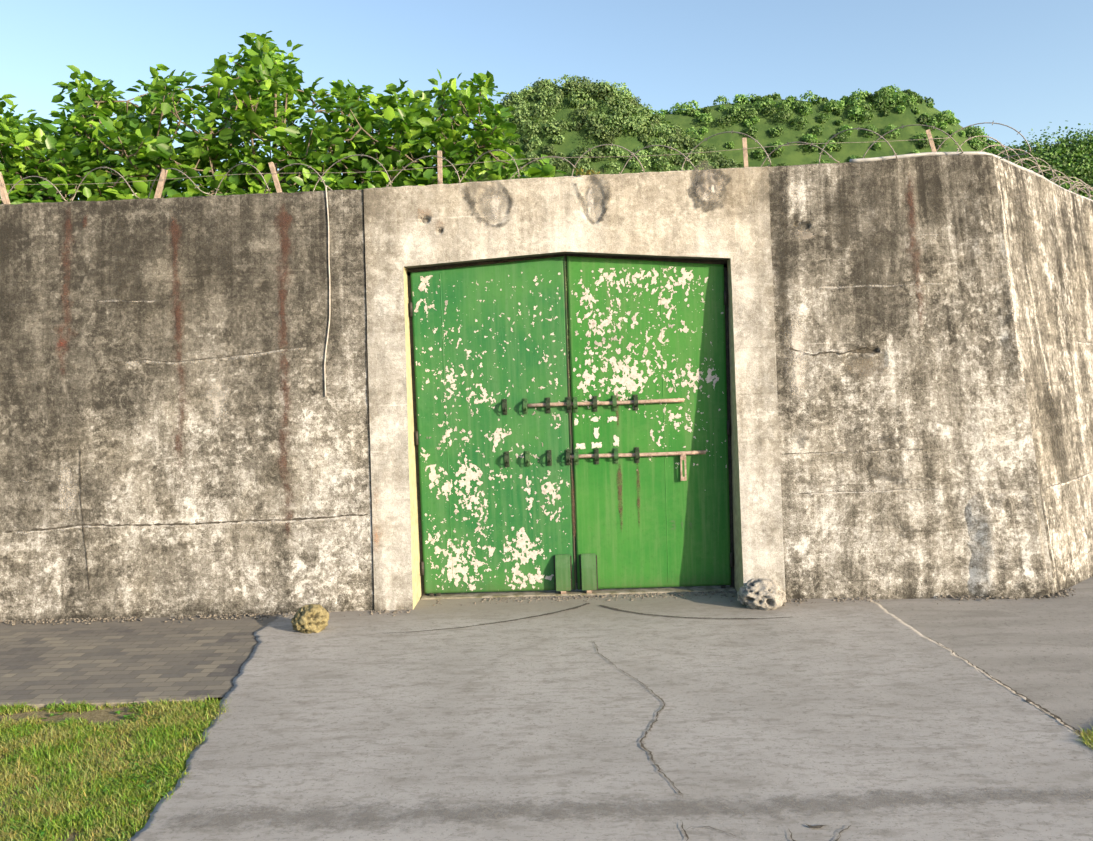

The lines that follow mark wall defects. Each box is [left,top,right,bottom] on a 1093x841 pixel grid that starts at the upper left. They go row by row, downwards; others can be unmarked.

rust [171,221,184,466]
rust [278,212,292,531]
peeling [413,267,726,591]
crack [790,347,855,355]
water stain [1003,199,1027,347]
crack [594,643,682,794]
crack [788,824,851,841]